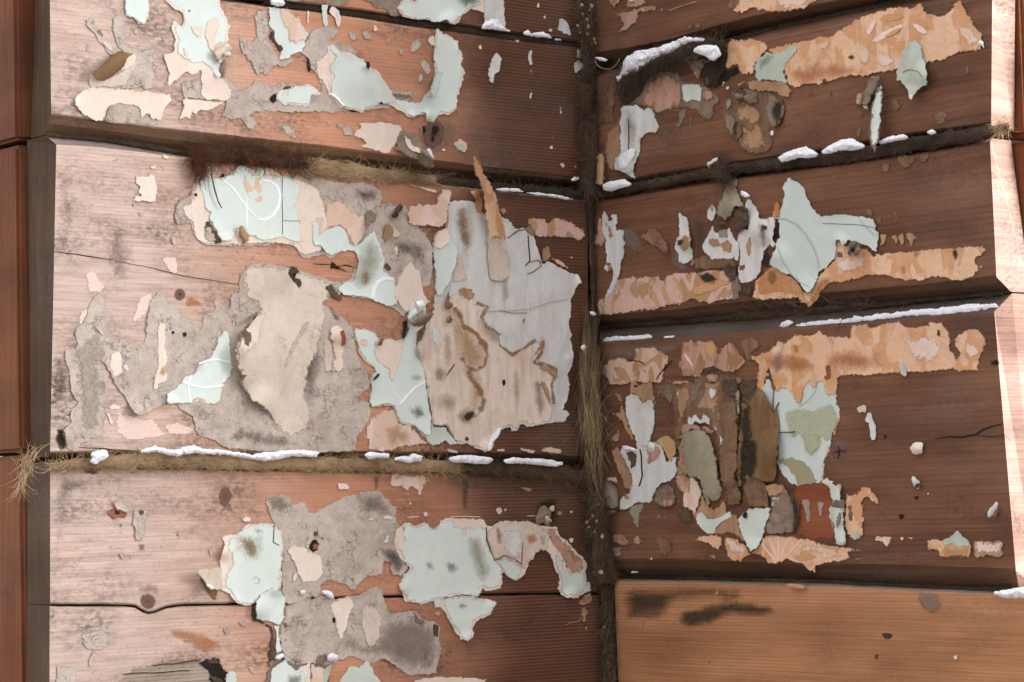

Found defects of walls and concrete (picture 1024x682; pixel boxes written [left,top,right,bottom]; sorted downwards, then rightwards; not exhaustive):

peeling [124,0,150,24]
peeling [322,5,341,29]
peeling [896,40,927,99]
peeling [133,155,169,216]
peeling [675,213,695,266]
crack [54,251,235,284]
peeling [238,312,266,358]
peeling [857,405,877,440]
crack [935,423,1005,439]
leakage [630,593,670,614]
leakage [683,590,771,625]
spalling [199,658,227,682]